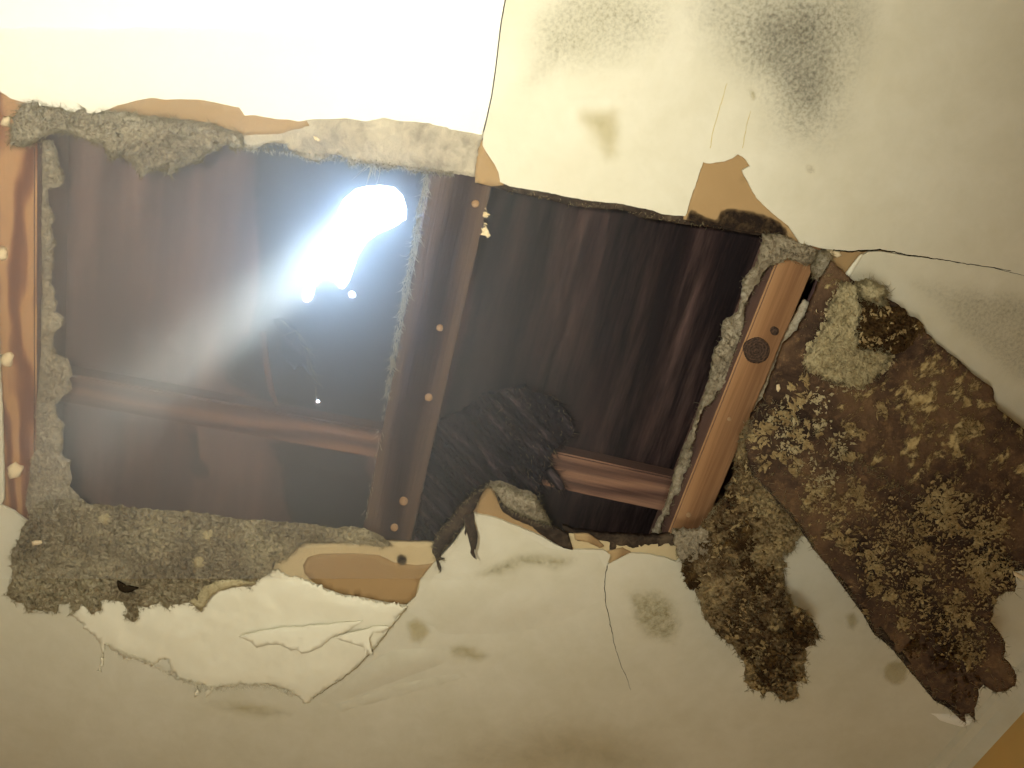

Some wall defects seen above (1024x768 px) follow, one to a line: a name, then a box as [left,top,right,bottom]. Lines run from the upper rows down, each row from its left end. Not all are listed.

peeling [11,98,320,174]
peeling [475,140,504,186]
peeling [480,208,491,238]
peeling [683,154,798,242]
crack [833,249,1021,275]
peeling [473,486,549,540]
peeling [273,540,436,604]
peeling [239,620,390,657]
crack [604,566,631,690]